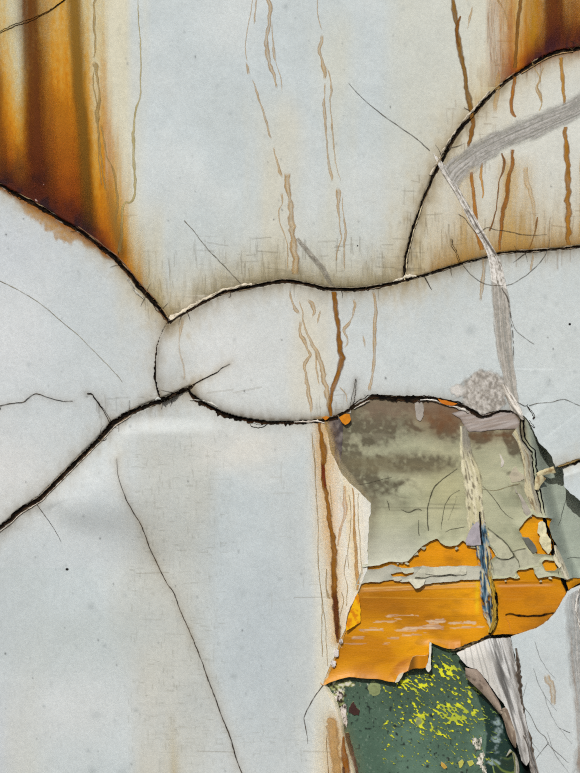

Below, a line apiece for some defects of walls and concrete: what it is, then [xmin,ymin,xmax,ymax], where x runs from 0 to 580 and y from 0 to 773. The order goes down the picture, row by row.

crack [0,0,64,33]
rust [497,0,580,117]
rust [0,0,142,285]
rust [274,150,299,272]
rust [489,149,514,250]
rust [563,127,572,245]
crack [0,41,580,539]
rust [290,291,356,416]
crack [117,471,242,773]
rust [312,422,362,666]
peeling [320,395,580,773]
rust [326,718,350,773]